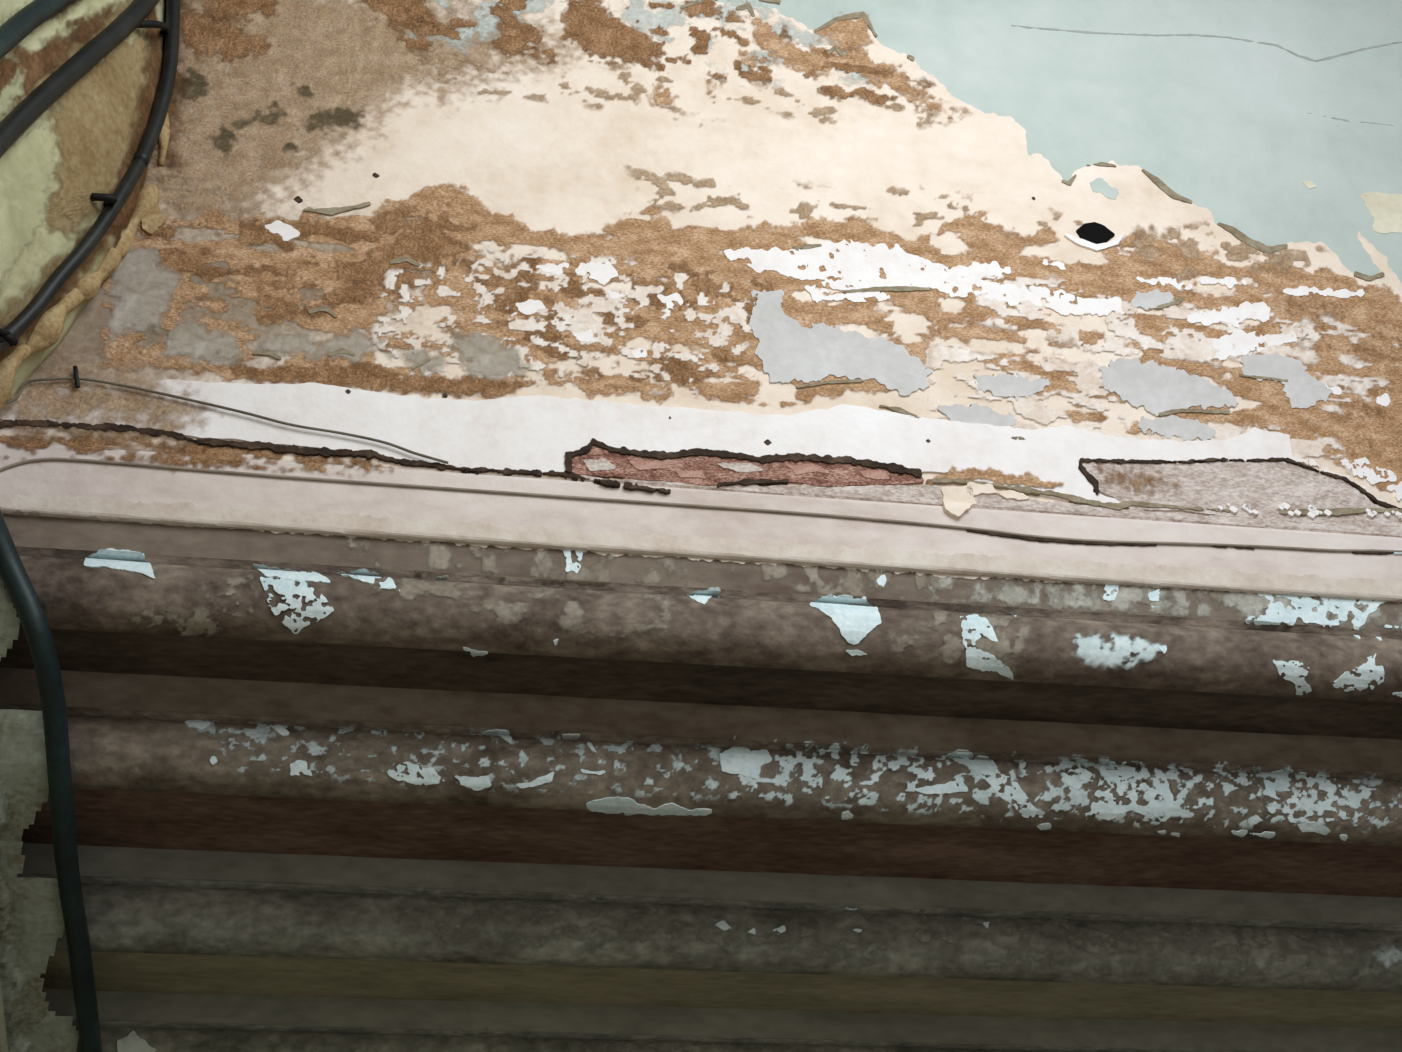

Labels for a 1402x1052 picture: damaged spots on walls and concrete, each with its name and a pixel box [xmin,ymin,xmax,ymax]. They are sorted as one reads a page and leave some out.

peeling [0,0,1402,538]
crack [0,419,671,495]
peeling [0,491,1402,698]
crack [925,478,1231,519]
spalling [0,709,79,1052]
peeling [185,720,1402,841]